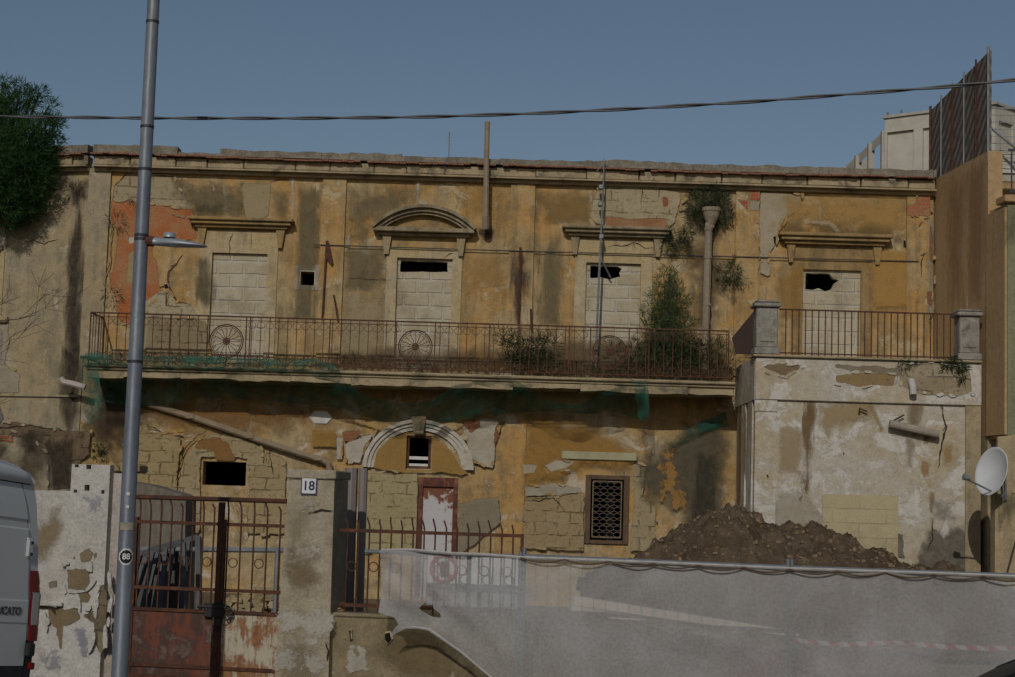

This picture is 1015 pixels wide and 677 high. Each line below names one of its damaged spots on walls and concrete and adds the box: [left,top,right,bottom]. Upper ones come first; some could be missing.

crack [160,255,188,306]
peeling [144,173,212,359]
leakage [242,183,271,218]
leakage [291,177,319,318]
peeling [589,186,687,227]
peeling [738,190,804,276]
leakage [60,183,126,447]
flaking render [835,358,976,397]
leakage [140,401,308,461]
crack [938,405,947,468]
leakage [918,528,965,570]
peeling [41,548,114,654]